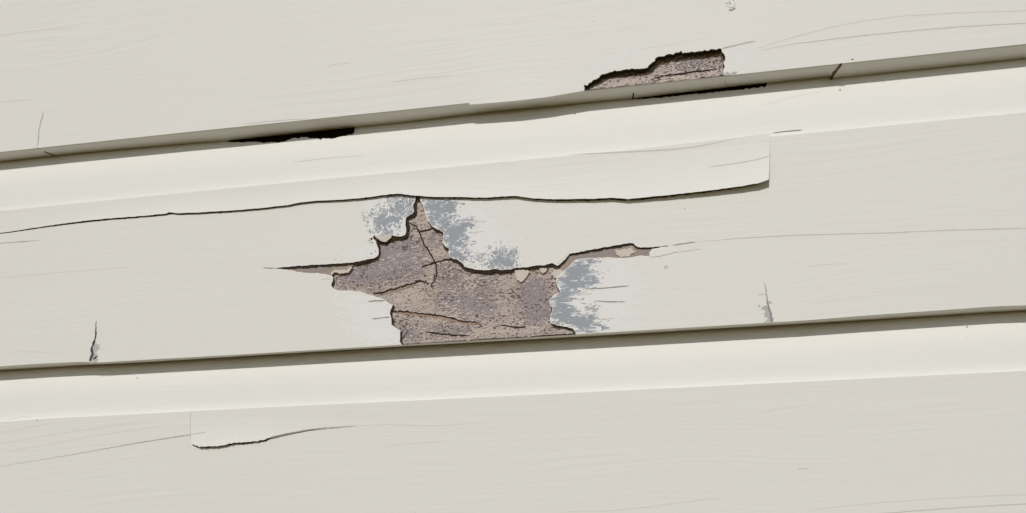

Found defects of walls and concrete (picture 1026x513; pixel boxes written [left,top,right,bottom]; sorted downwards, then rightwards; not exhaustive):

peeling [615,247,636,257]
peeling [515,267,564,283]
crack [89,321,97,361]